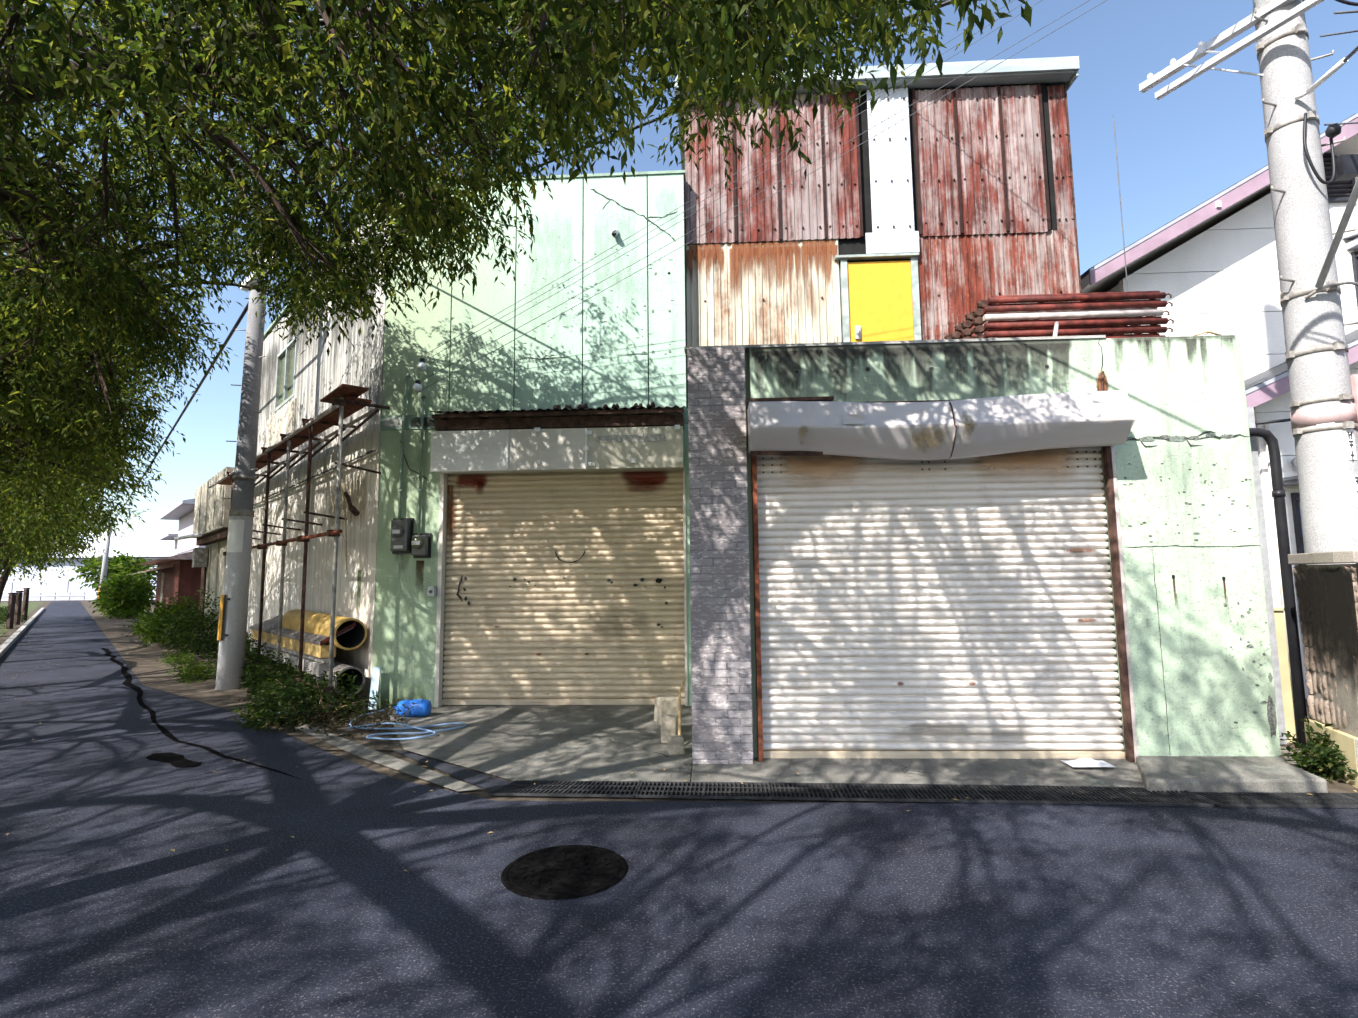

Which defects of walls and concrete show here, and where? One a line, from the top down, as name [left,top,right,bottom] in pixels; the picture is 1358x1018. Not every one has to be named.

crack [591,189,676,242]
rust [686,240,837,304]
water stain [751,339,1070,391]
water stain [1114,335,1234,358]
crack [1126,431,1248,447]
rust [447,475,486,536]
rust [623,471,666,490]
water stain [1294,562,1358,680]